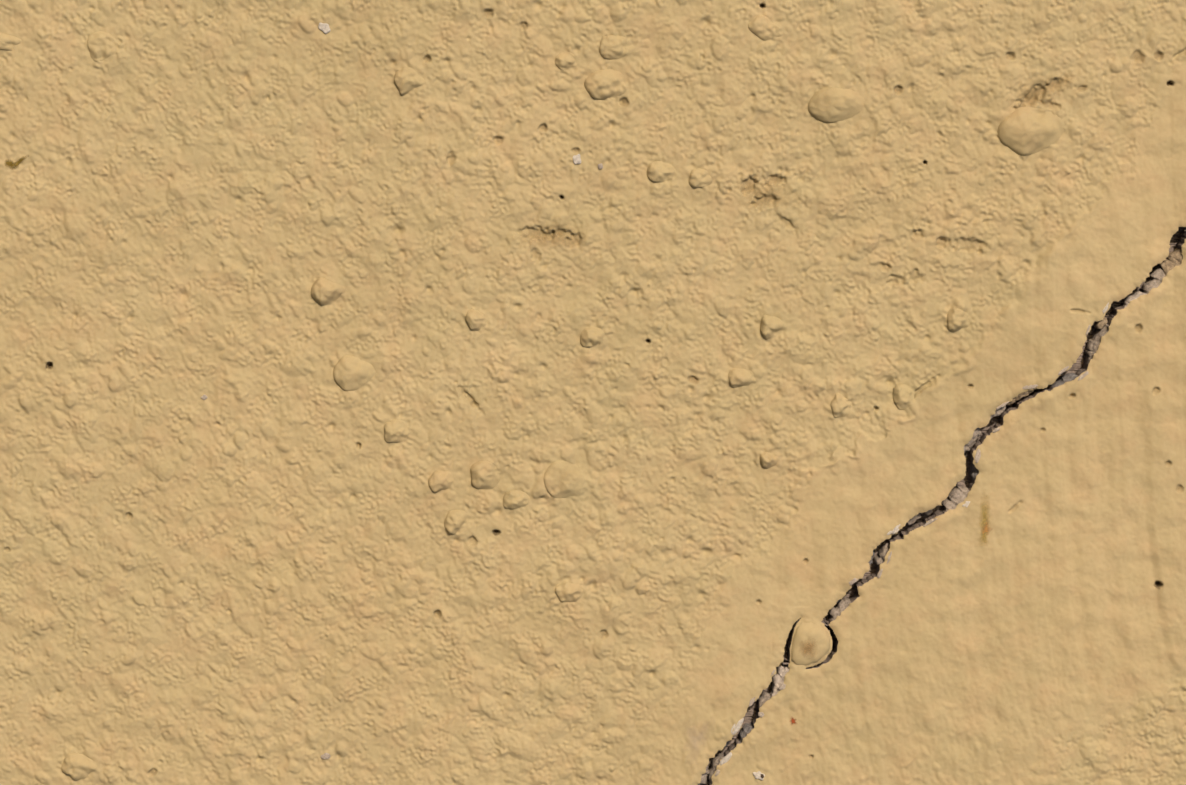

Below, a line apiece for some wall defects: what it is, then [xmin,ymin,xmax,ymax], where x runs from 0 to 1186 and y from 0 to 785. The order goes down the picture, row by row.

crack [697,227,1186,785]